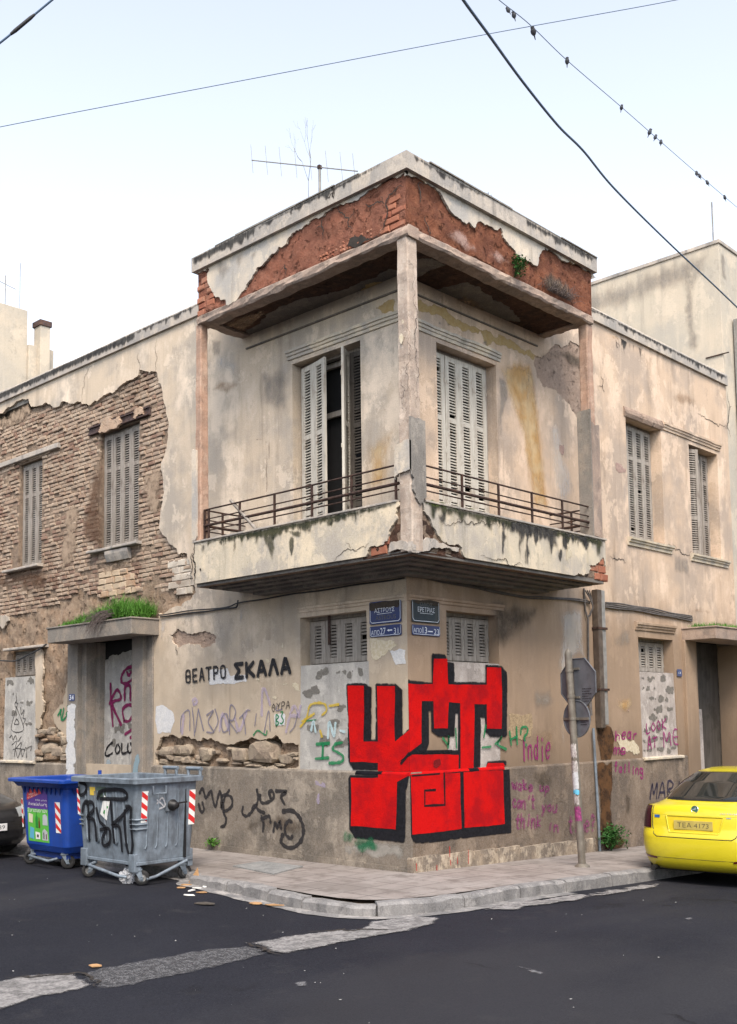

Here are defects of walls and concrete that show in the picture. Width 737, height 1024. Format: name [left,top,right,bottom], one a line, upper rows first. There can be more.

flaking render [0,370,196,763]